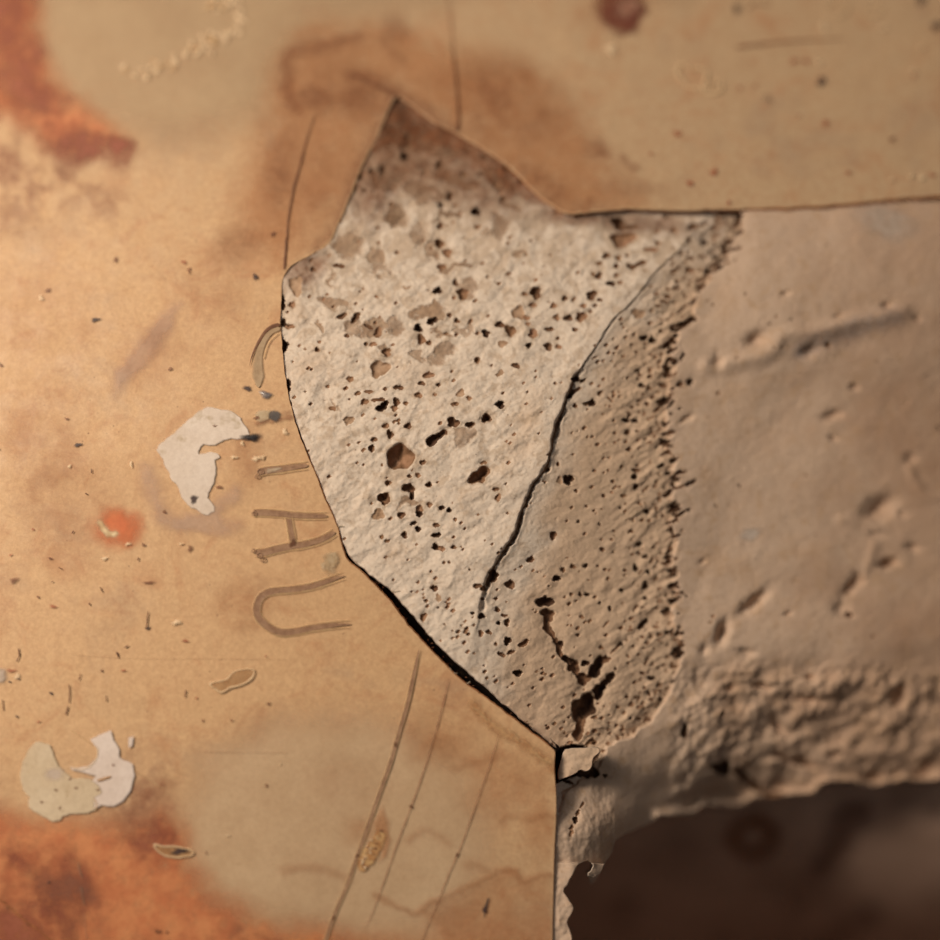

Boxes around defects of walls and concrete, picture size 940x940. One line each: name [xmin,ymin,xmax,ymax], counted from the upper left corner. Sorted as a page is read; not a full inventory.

corrosion [600,0,646,35]
corrosion [0,0,133,164]
water stain [354,98,543,207]
peeling [157,407,249,515]
crack [485,246,684,587]
spalling [280,97,940,788]
peeling [20,731,134,822]